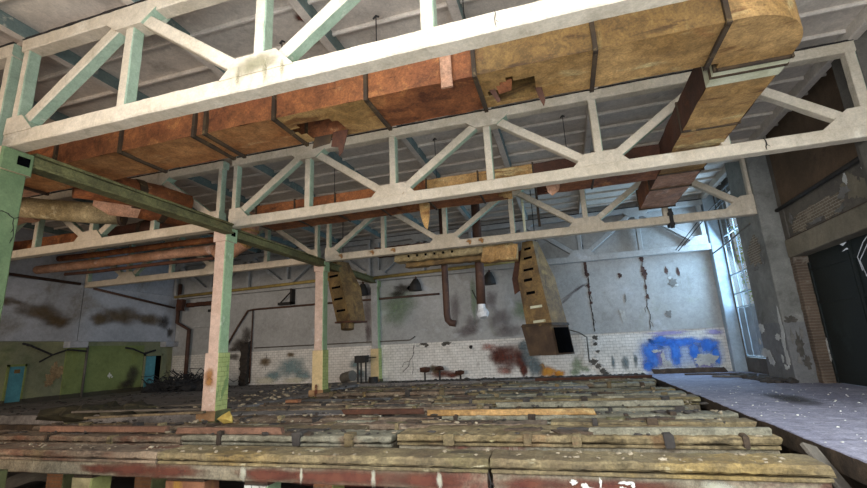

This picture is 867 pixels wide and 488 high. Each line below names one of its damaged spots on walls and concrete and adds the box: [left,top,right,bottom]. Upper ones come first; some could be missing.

flaking render [788,168,867,233]
leakage [4,298,67,327]
leakage [93,310,158,325]
peeling [758,306,812,370]